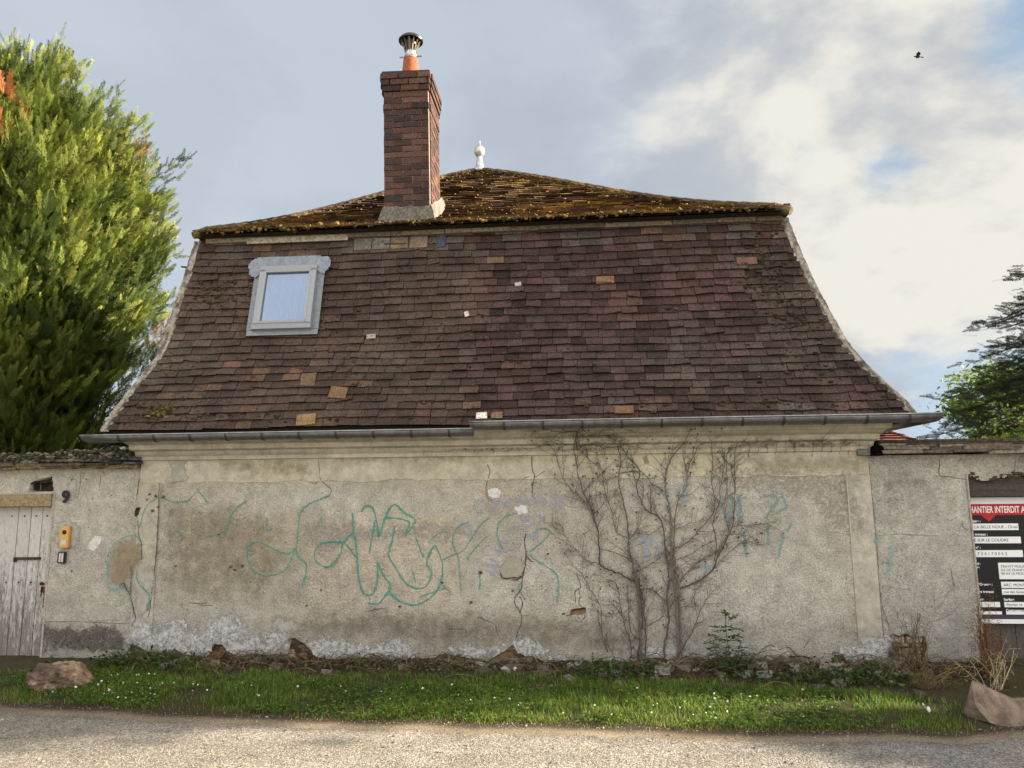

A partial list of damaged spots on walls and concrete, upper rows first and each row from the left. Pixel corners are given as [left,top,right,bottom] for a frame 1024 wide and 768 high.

spalling [968,471,1024,481]
crack [479,533,534,639]
water stain [126,610,425,660]
water stain [448,636,580,662]